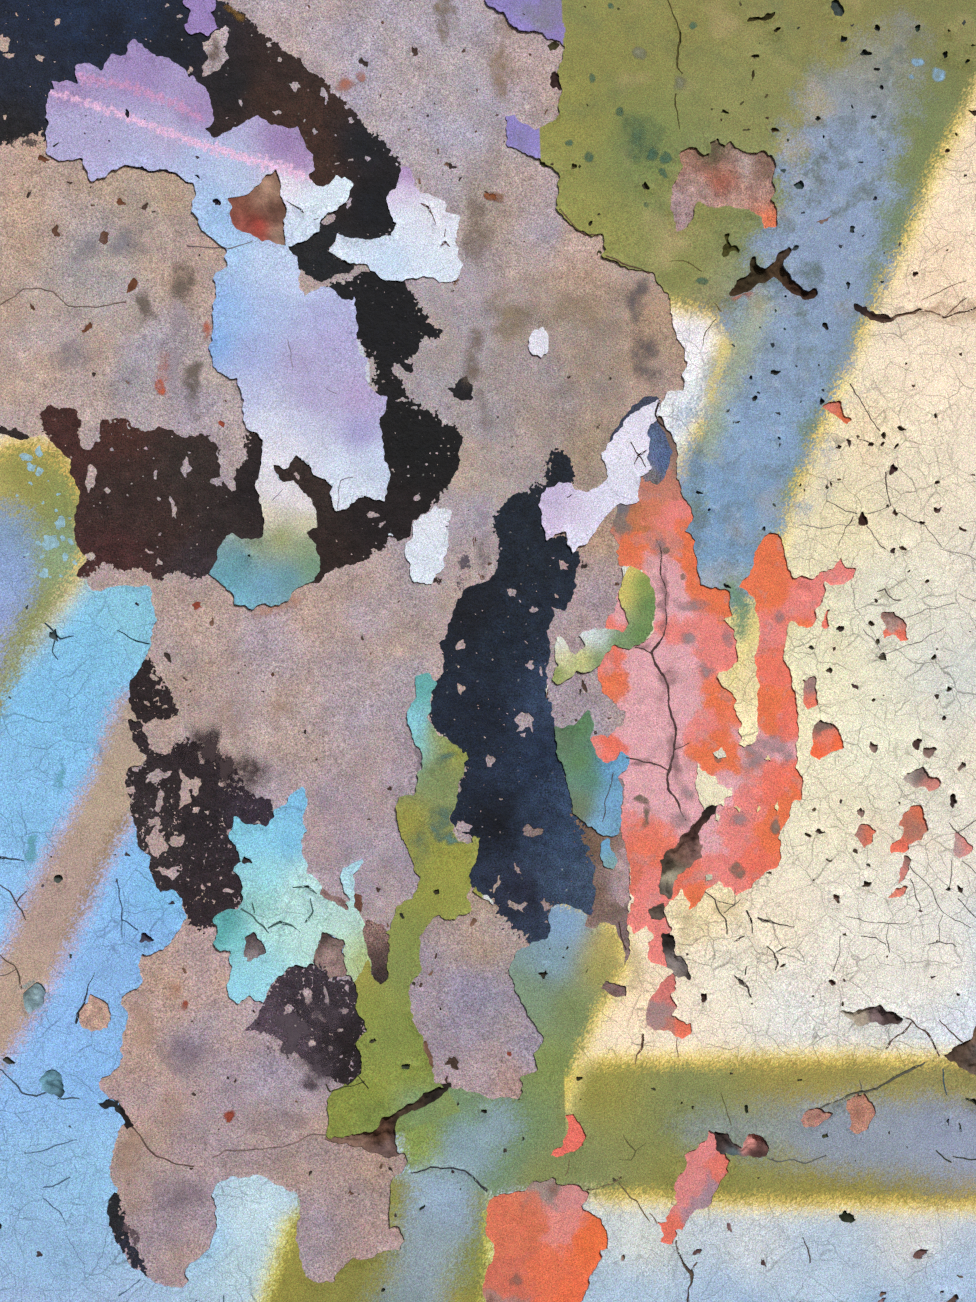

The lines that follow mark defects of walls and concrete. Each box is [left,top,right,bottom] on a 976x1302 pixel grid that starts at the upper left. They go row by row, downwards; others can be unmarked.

peeling [670,139,804,232]
spalling [722,233,817,313]
crack [884,280,976,322]
crack [630,400,666,467]
peeling [0,0,687,1288]
crack [602,539,689,822]
spalling [648,805,718,980]
crack [705,891,795,998]
crack [833,820,976,972]
crack [821,1016,976,1163]
spalling [944,1026,976,1075]
crack [565,1135,698,1302]